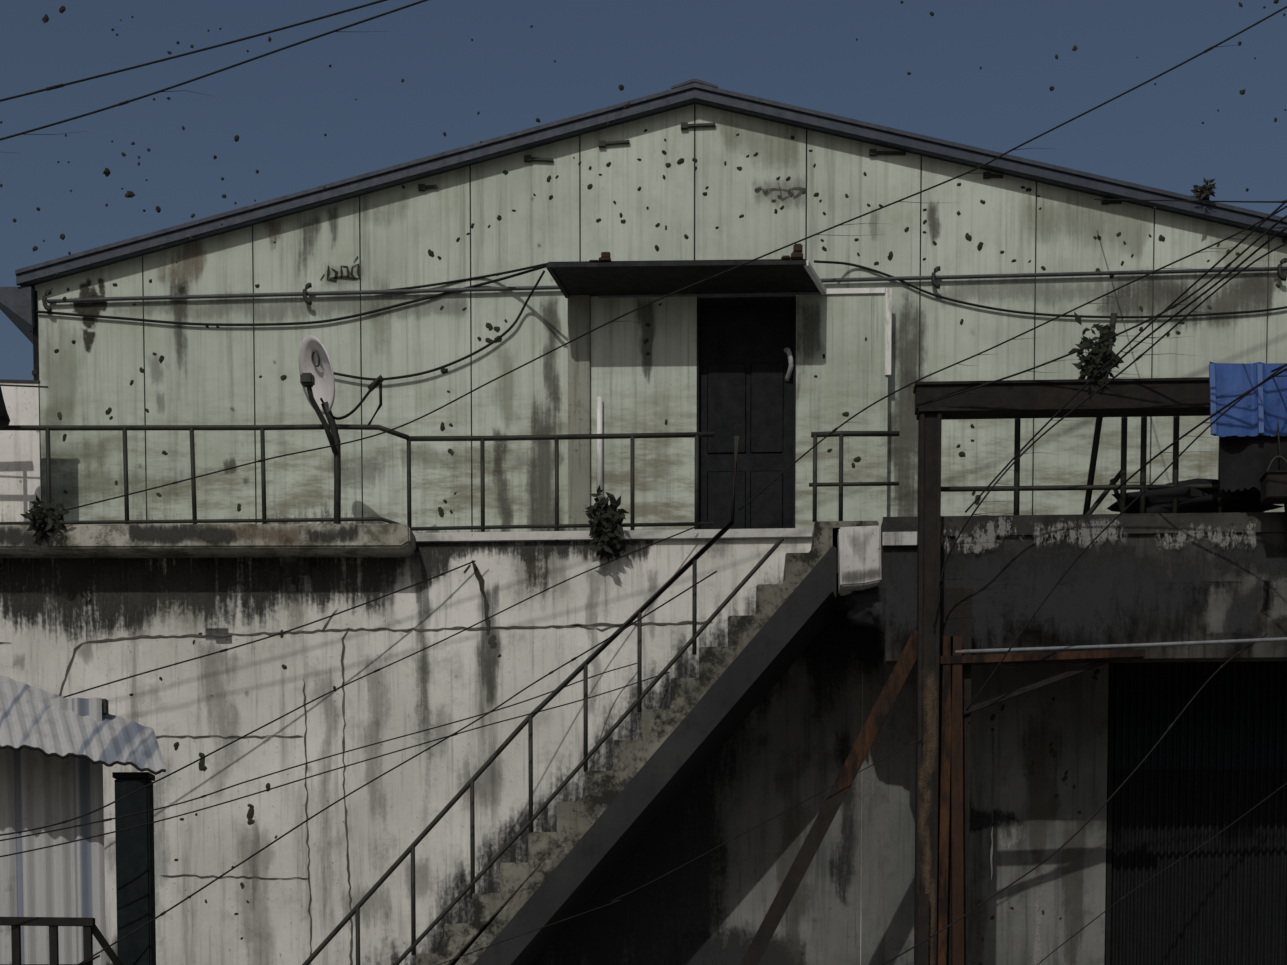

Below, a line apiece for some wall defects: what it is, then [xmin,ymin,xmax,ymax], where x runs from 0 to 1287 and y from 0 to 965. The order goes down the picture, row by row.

water stain [73,279,117,352]
water stain [638,301,662,377]
water stain [0,301,597,683]
water stain [621,540,653,559]
peeling [944,518,1016,553]
peeling [1035,520,1122,546]
peeling [1159,524,1256,549]
water stain [478,588,499,700]
water stain [805,610,885,717]
corrosion [833,630,918,795]
water stain [829,770,861,902]